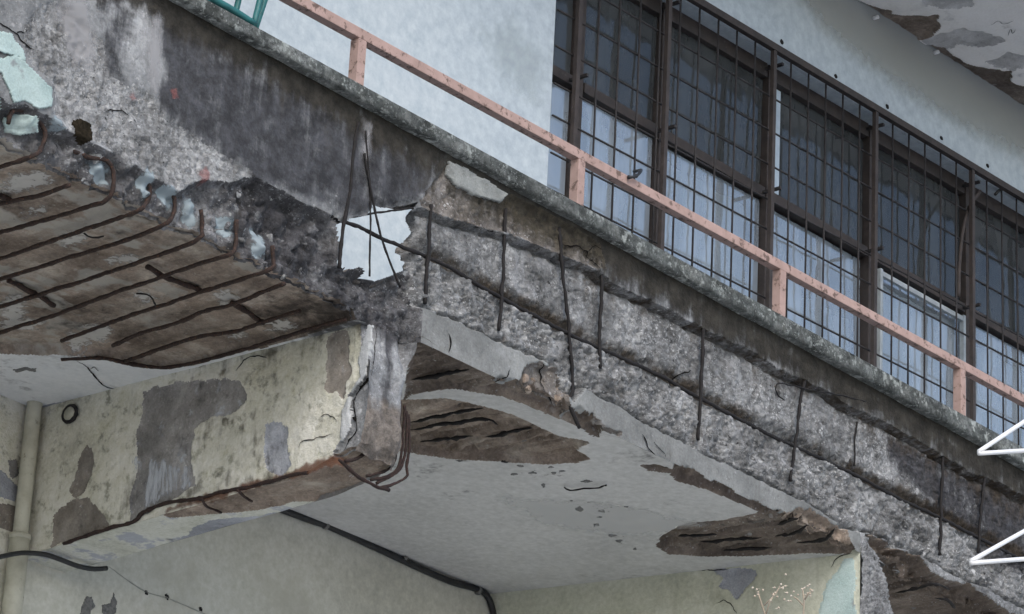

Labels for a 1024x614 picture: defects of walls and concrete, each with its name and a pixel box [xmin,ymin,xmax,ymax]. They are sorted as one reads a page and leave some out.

spalling [0,31,423,442]
flaking render [444,161,508,203]
rust [167,456,348,512]
peeling [50,327,623,548]
spalling [382,204,1024,614]